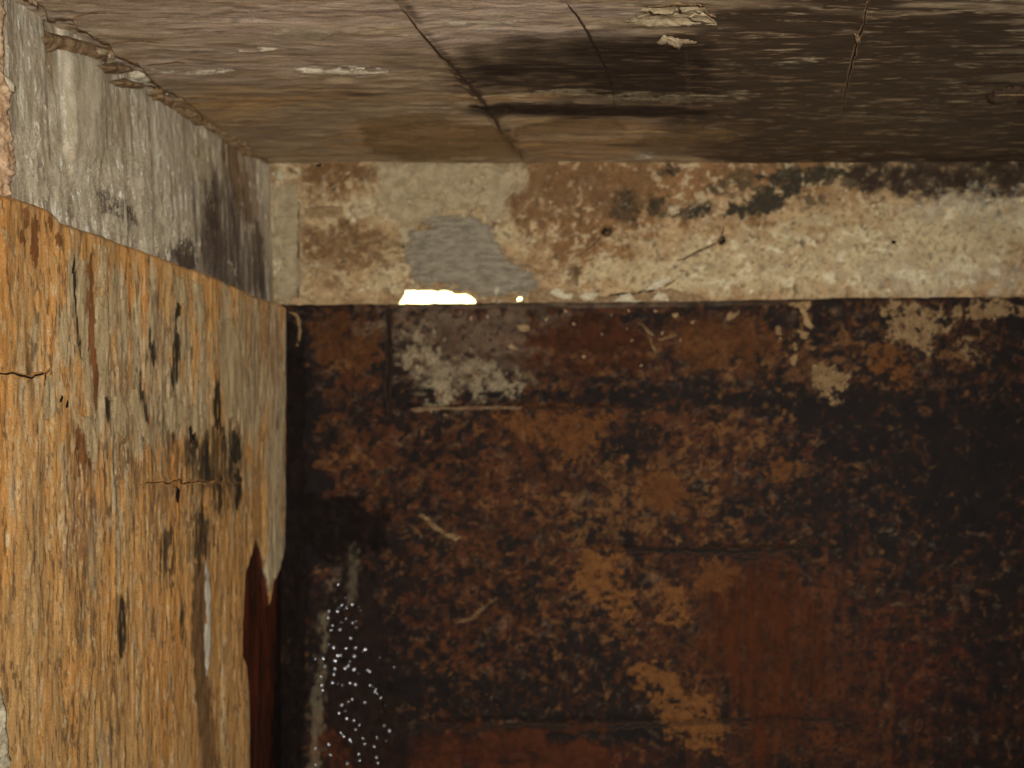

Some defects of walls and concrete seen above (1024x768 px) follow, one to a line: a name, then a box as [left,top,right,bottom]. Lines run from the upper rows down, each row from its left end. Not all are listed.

spalling [623,2,717,49]
crack [567,4,617,109]
crack [405,12,523,159]
corrosion [20,207,63,268]
mould [608,190,665,221]
mould [688,205,711,218]
mould [723,164,849,220]
spalling [528,277,707,303]
corrosion [86,253,99,411]
crack [0,368,51,385]
corrosion [73,424,91,476]
damp [172,378,242,768]